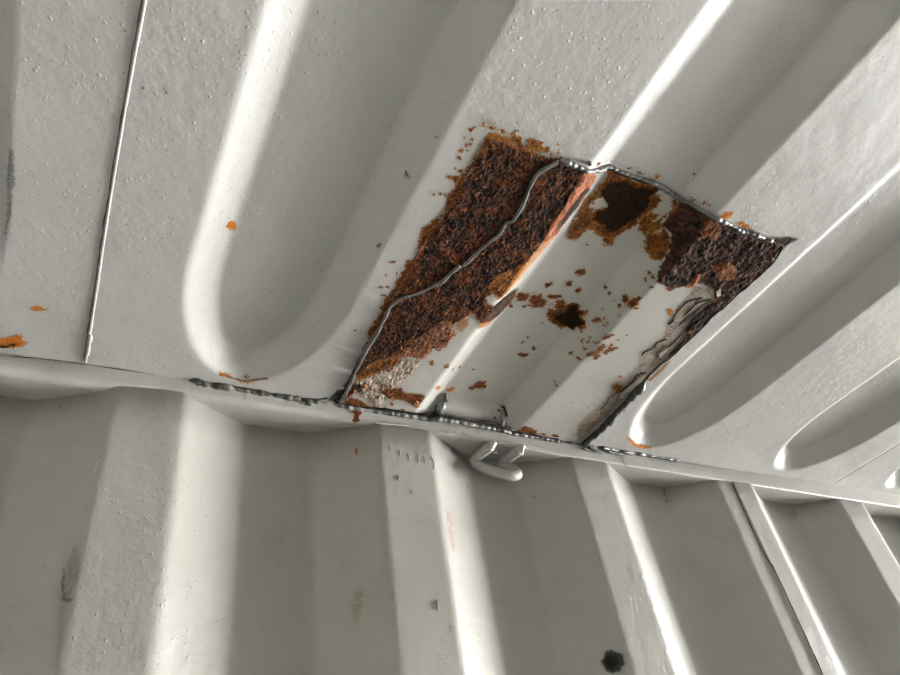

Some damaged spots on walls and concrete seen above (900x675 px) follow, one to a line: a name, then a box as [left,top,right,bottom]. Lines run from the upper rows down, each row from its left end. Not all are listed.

corrosion [354,121,798,382]
corrosion [0,334,29,349]
corrosion [219,372,268,384]
peeling [345,349,448,411]
corrosion [445,359,487,393]
peeling [575,285,721,441]
corrosion [480,391,560,438]